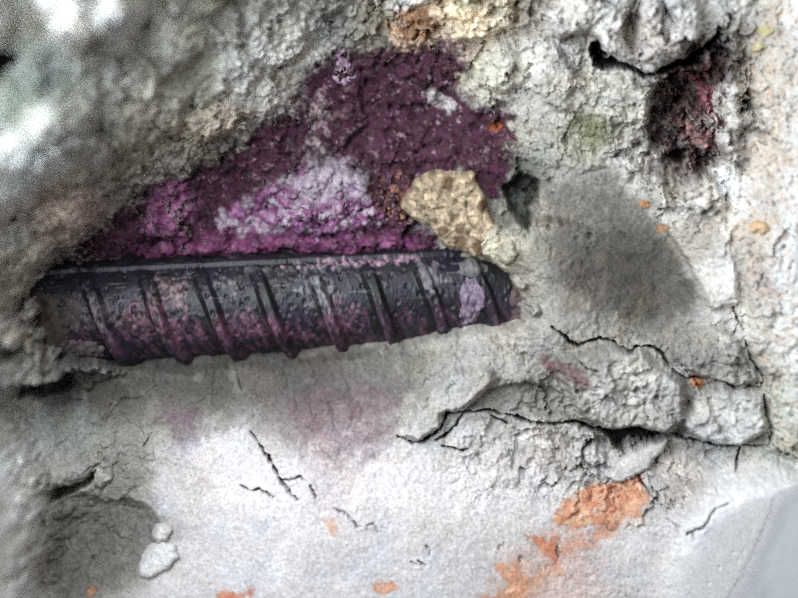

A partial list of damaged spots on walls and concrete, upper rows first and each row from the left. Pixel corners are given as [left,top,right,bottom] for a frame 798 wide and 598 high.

spalling [401,166,496,258]
spalling [504,176,538,229]
spalling [497,239,519,266]
crack [561,332,669,364]
crack [422,408,600,450]